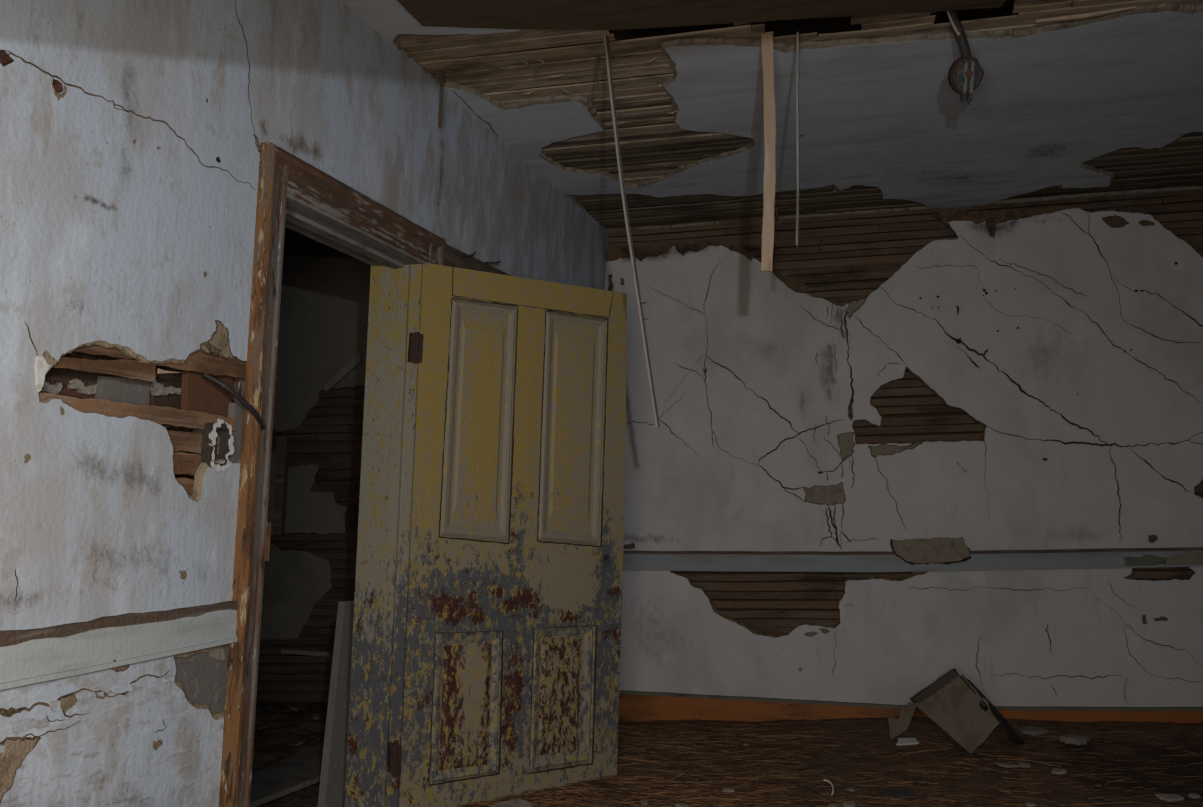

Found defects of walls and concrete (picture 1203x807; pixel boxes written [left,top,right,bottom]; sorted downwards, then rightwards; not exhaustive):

crack [0,50,255,190]
spalling [393,0,1203,318]
spalling [34,320,247,503]
spalling [837,366,987,462]
crack [627,212,1203,550]
spalling [1194,479,1203,499]
spalling [670,539,971,638]
spalling [1124,535,1203,581]
spalling [0,664,133,803]
crack [0,670,170,745]
spalling [163,644,229,720]